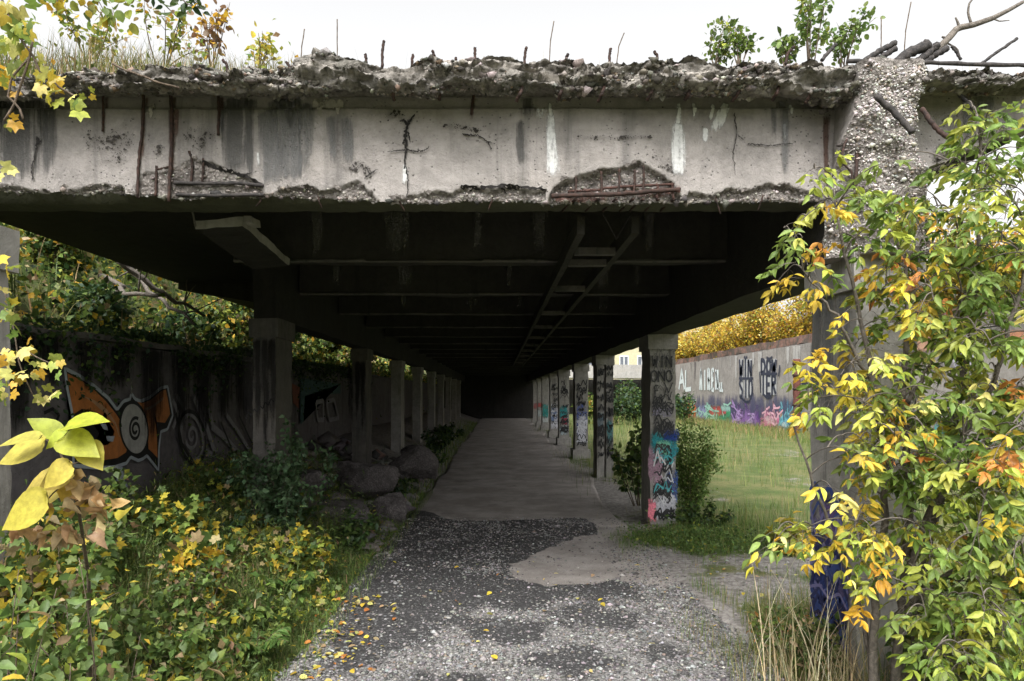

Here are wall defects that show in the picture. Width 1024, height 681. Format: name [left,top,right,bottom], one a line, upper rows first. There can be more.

leakage [0,100,57,178]
leakage [220,97,353,181]
crack [364,114,429,197]
spalling [0,40,864,227]
leakage [516,98,557,174]
efflorescence [671,103,697,174]
efflorescence [703,103,729,142]
crack [732,113,792,170]
spalling [873,93,916,135]
spalling [912,67,1024,164]